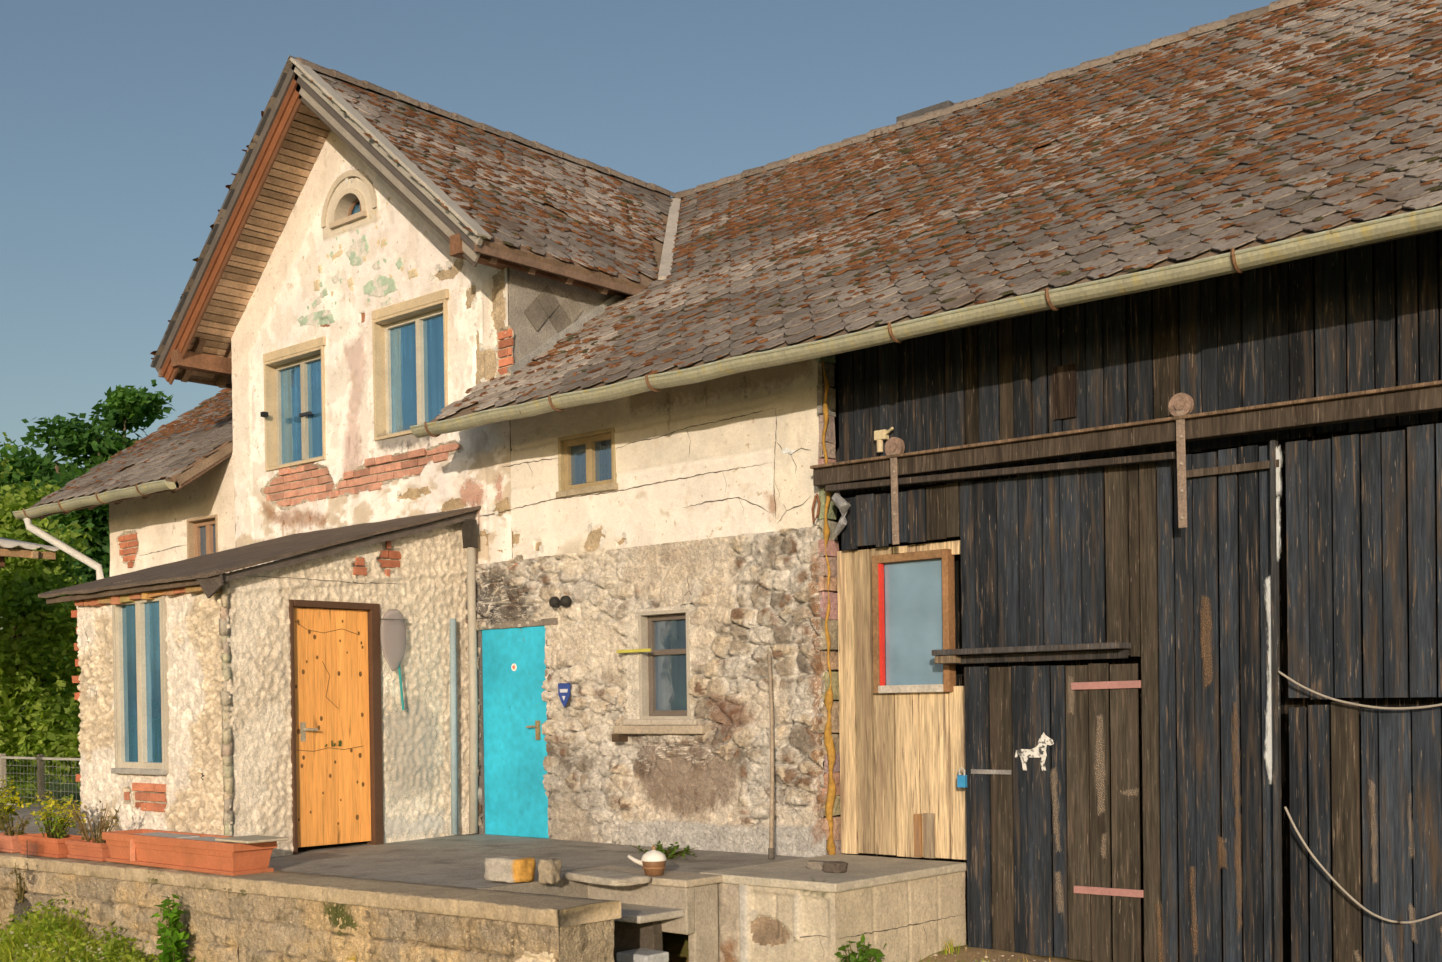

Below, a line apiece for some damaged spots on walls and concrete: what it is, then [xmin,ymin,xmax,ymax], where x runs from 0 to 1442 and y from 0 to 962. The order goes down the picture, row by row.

peeling [297,196,465,330]
spalling [465,269,514,385]
flaking render [260,440,466,513]
crack [475,408,811,521]
flaking render [116,530,139,568]
flaking render [351,541,404,578]
spalling [748,910,790,955]